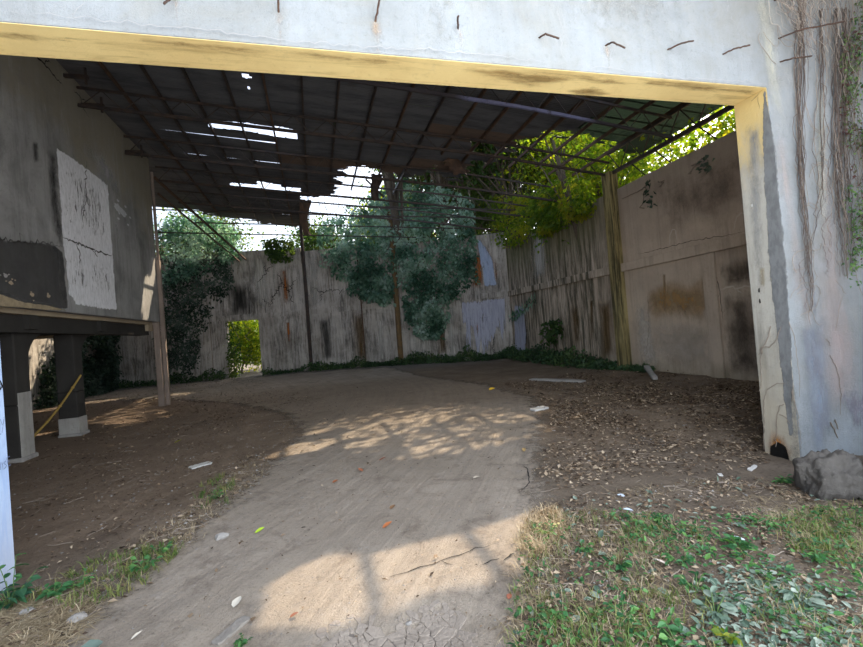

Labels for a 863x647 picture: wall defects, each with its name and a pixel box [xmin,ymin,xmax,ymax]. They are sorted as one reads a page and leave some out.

leakage [494,71,561,83]
peeling [57,149,131,310]
crack [0,233,114,262]
leakage [729,263,749,280]
peeling [0,291,64,311]
leakage [731,302,756,368]